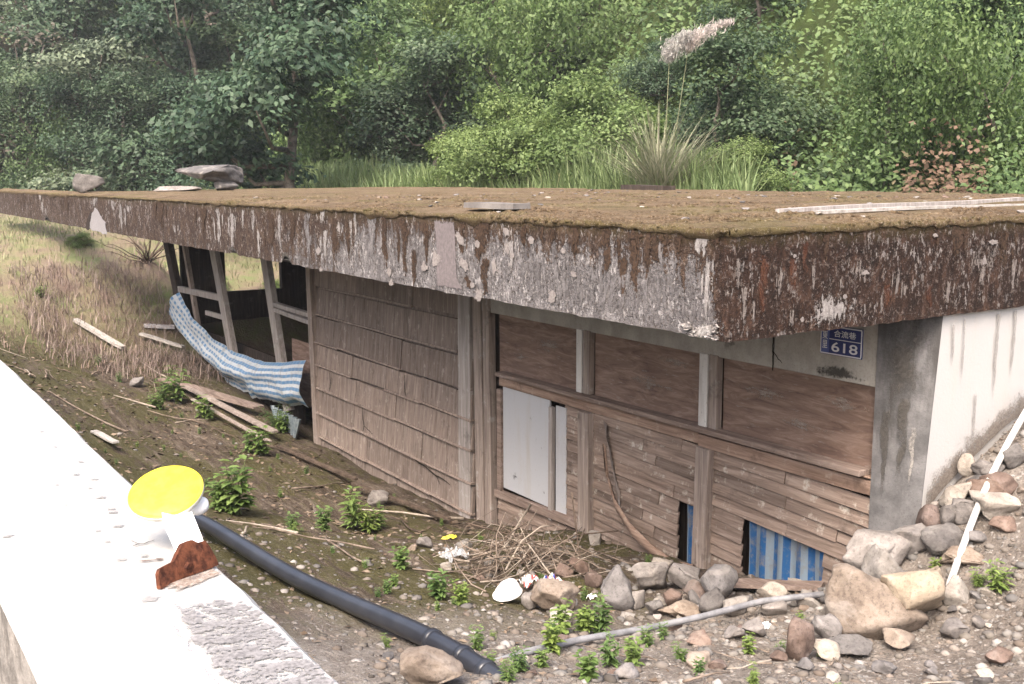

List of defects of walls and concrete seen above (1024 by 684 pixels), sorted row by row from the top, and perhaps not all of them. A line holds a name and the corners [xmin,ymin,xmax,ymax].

spalling [86,208,107,234]
water stain [818,367,861,380]
water stain [952,319,966,371]
water stain [993,314,1001,385]
water stain [880,327,927,489]